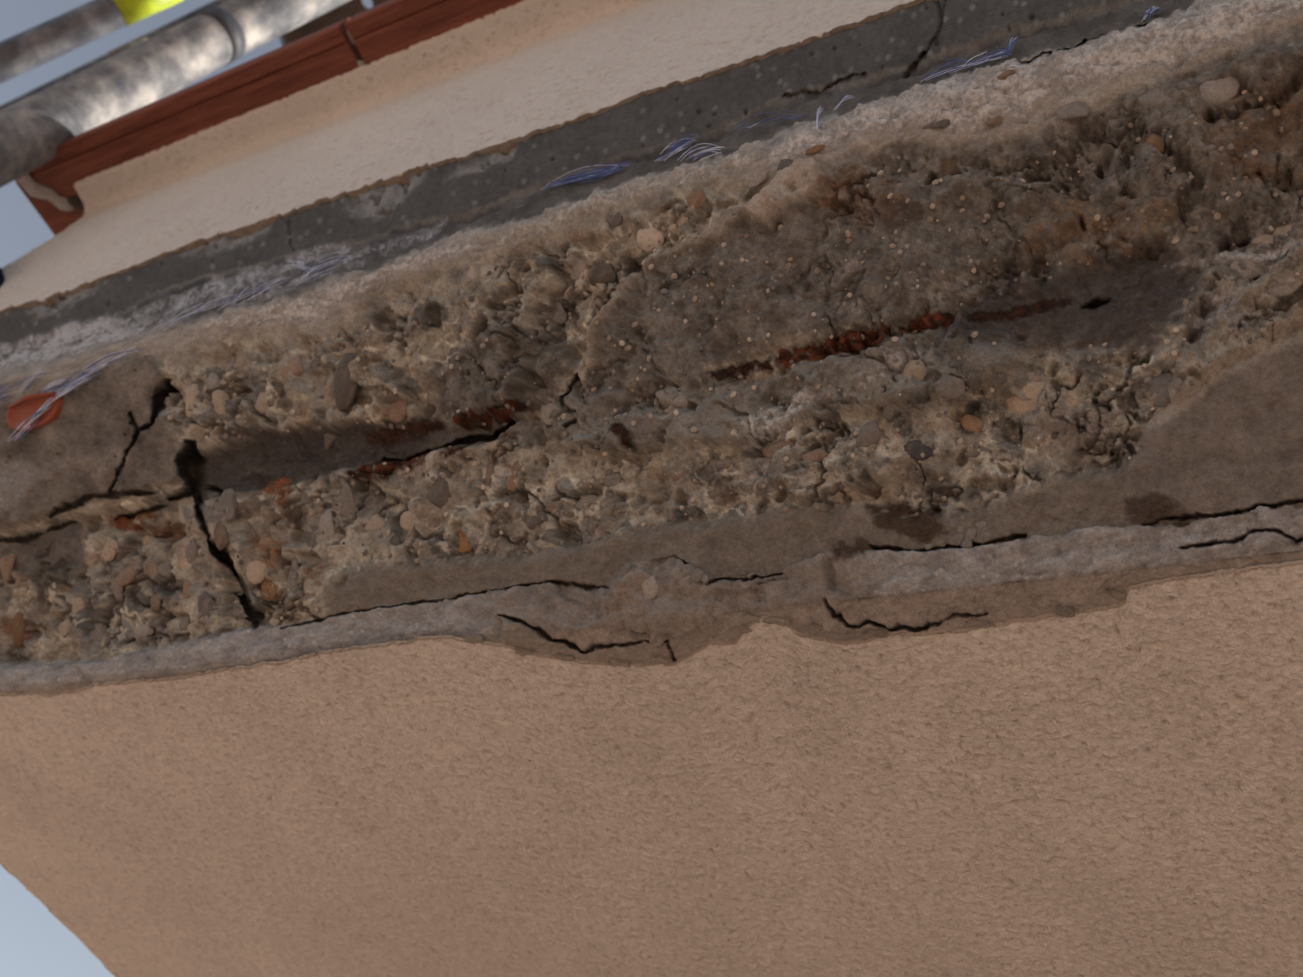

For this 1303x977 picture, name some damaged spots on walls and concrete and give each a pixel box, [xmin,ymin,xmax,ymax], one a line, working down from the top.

crack [905,0,946,79]
crack [783,72,866,99]
spalling [0,0,1303,668]
corrosion [711,298,1071,381]
corrosion [347,399,533,484]
corrosion [610,423,634,450]
crack [0,374,677,661]
crack [1154,500,1303,549]
crack [826,600,980,632]